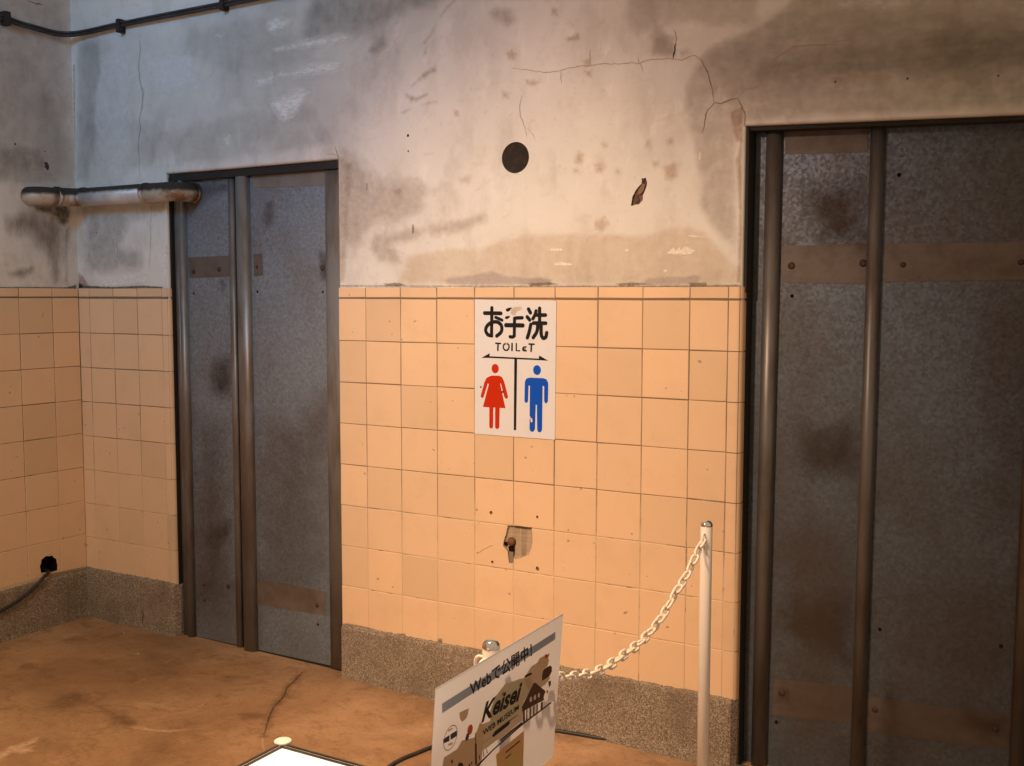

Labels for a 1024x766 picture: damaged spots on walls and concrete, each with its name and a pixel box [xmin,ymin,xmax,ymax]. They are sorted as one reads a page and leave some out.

crack [512,30,813,133]
flaking render [631,178,647,206]
spalling [503,525,533,563]
crack [261,673,301,751]